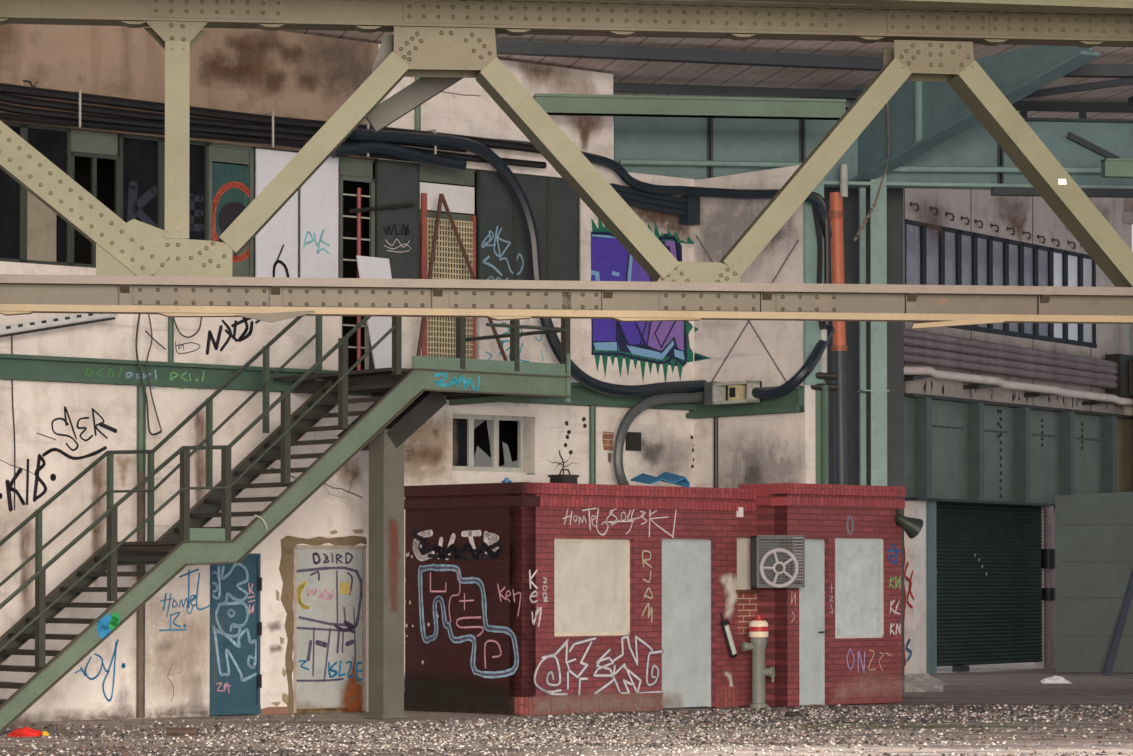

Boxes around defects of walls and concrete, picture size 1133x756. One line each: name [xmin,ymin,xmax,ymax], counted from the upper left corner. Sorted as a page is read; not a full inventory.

damp [726,447,793,488]
spalling [261,529,367,715]